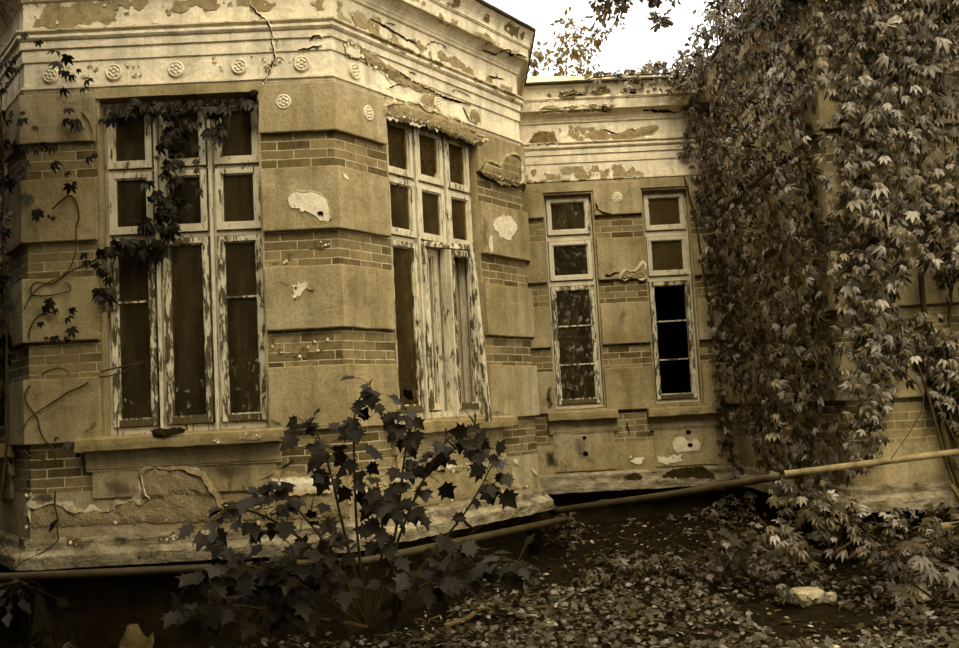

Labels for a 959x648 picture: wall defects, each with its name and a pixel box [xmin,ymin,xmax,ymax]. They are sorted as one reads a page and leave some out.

peeling [32,0,148,29]
peeling [162,0,276,23]
crack [248,0,323,87]
flaking render [337,0,659,187]
peeling [286,189,333,225]
peeling [487,210,519,254]
peeling [291,280,309,299]
peeling [656,433,702,465]